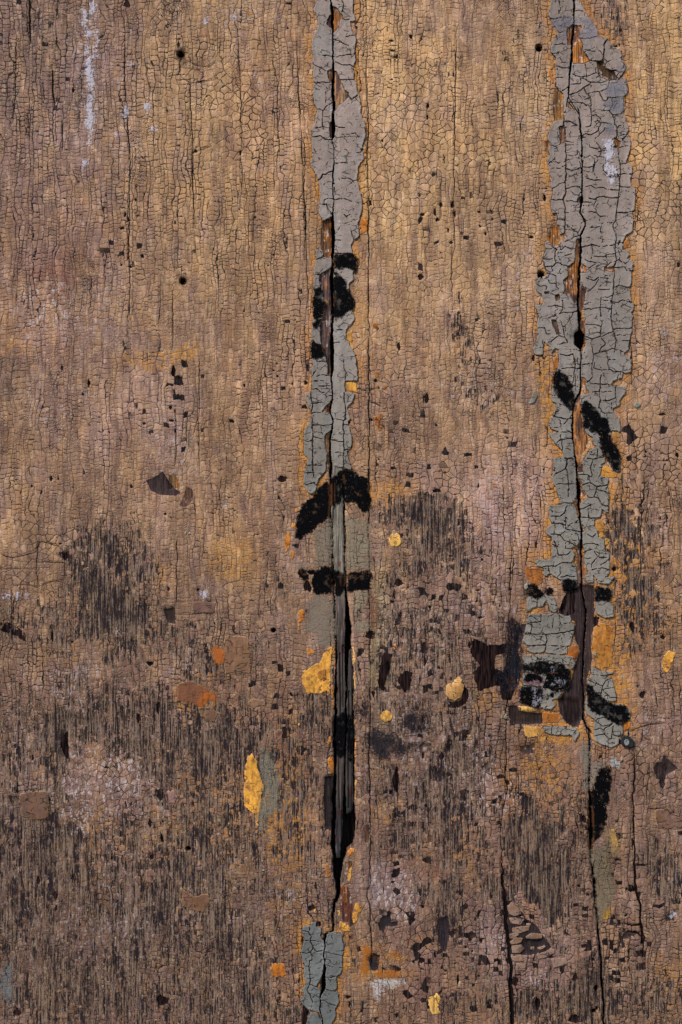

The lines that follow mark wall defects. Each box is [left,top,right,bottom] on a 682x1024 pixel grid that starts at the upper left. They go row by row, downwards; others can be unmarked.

peeling [291,0,372,494]
peeling [449,0,636,791]
peeling [300,824,369,1024]